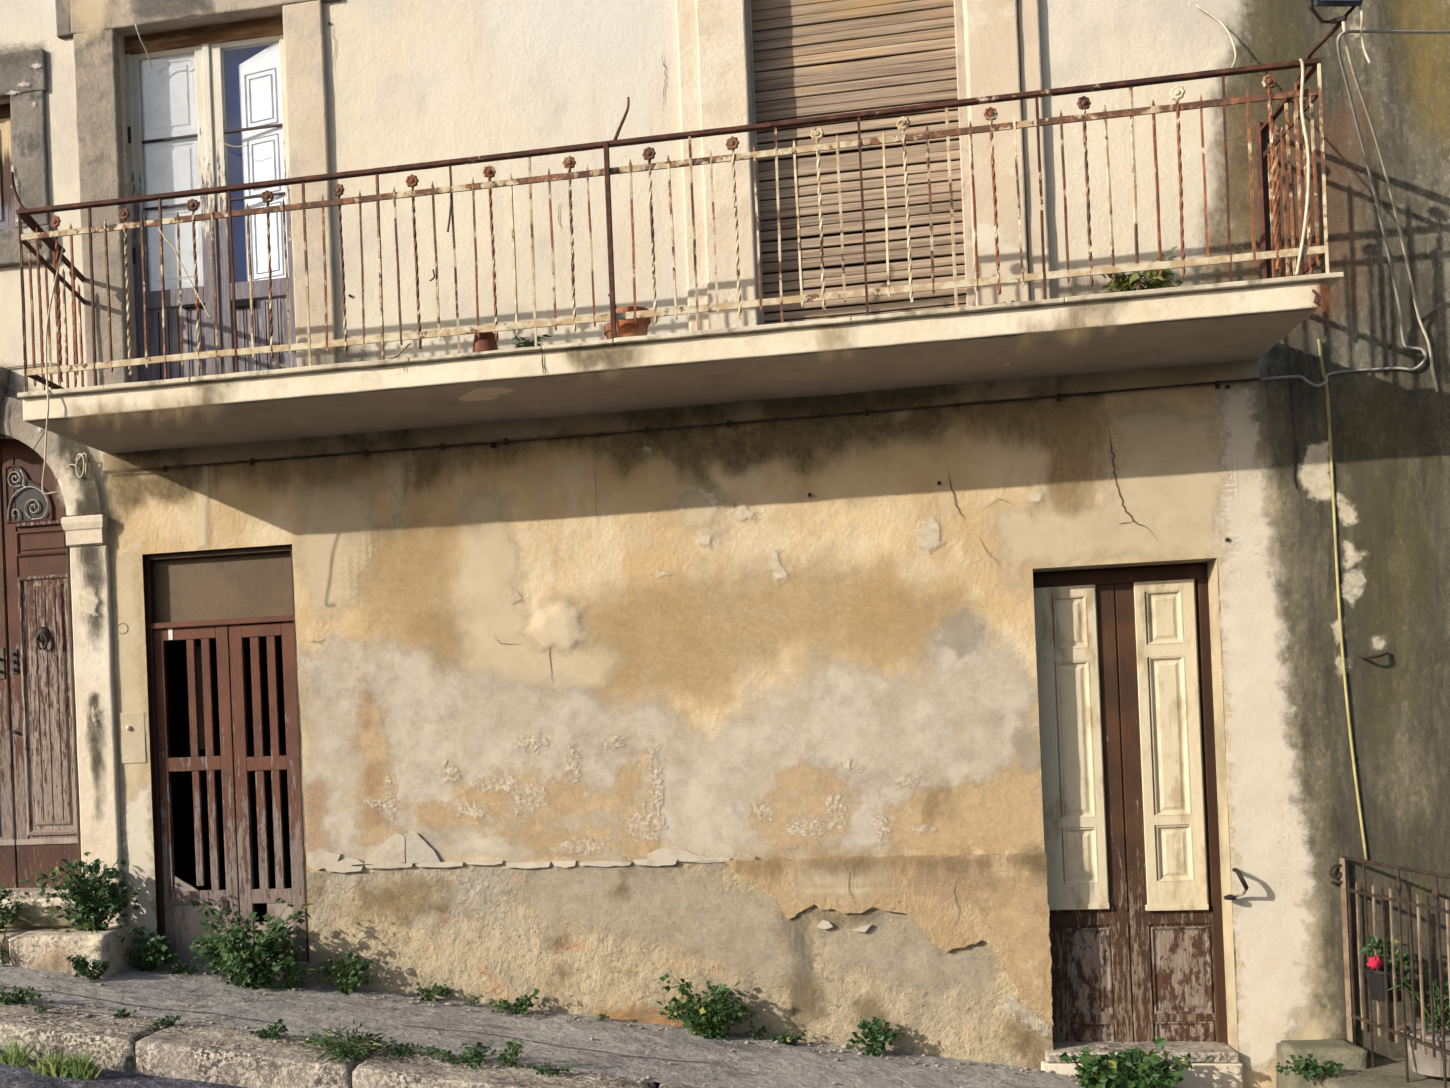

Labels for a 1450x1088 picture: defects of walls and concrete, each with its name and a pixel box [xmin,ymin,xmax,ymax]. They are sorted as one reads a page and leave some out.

damp [76,543,101,633]
crack [497,640,553,683]
peeling [770,549,788,579]
crack [1105,420,1158,540]
damp [1170,0,1450,1058]
peeling [1299,442,1366,604]
peeling [1331,619,1350,674]
peeling [1373,637,1385,649]
damp [87,693,103,811]
peeling [299,623,1054,1036]